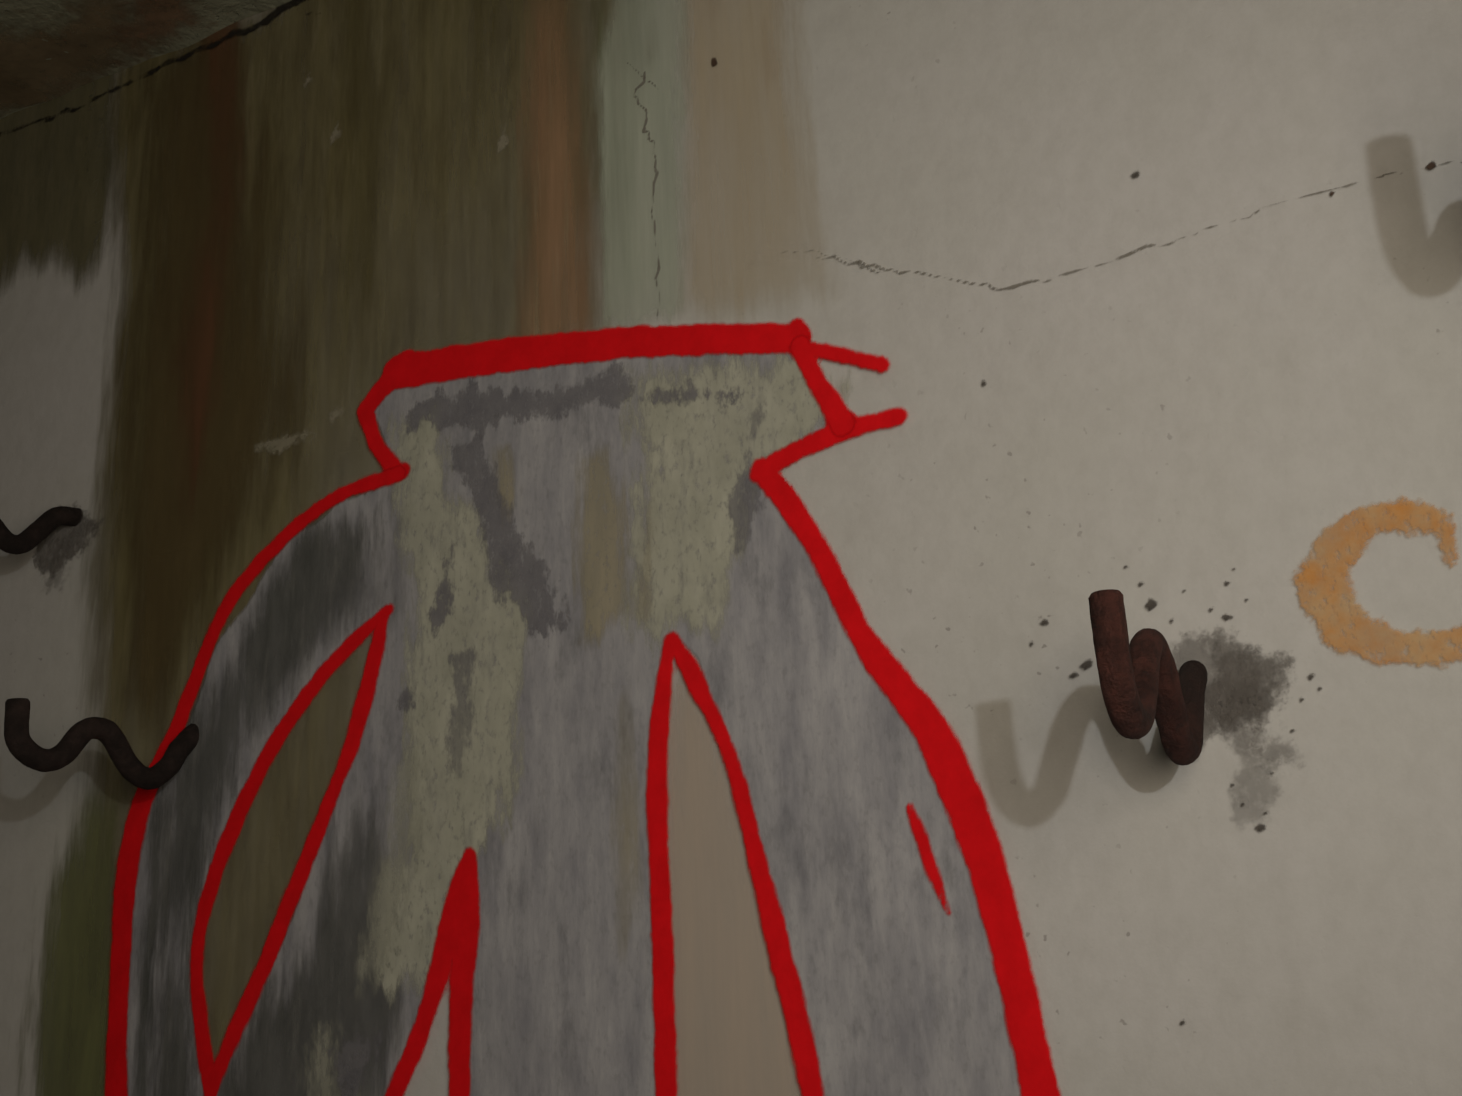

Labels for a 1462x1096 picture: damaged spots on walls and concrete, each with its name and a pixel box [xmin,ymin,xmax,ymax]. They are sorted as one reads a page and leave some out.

crack [635,72,660,315]
leakage [600,0,787,320]
crack [794,243,1172,290]
crack [1303,172,1395,197]